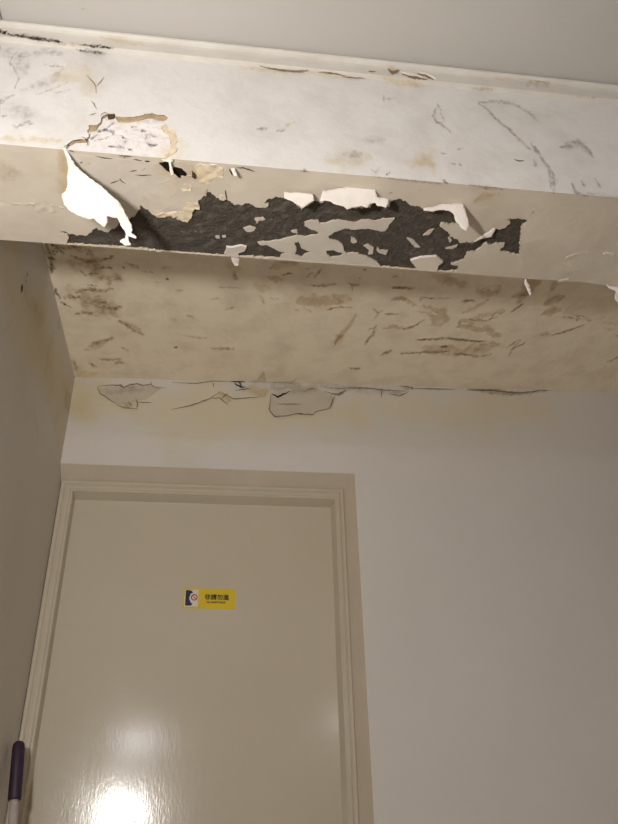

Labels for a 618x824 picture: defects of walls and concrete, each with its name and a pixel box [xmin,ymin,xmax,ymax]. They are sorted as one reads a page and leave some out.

damp [0,30,61,43]
spalling [62,114,618,302]